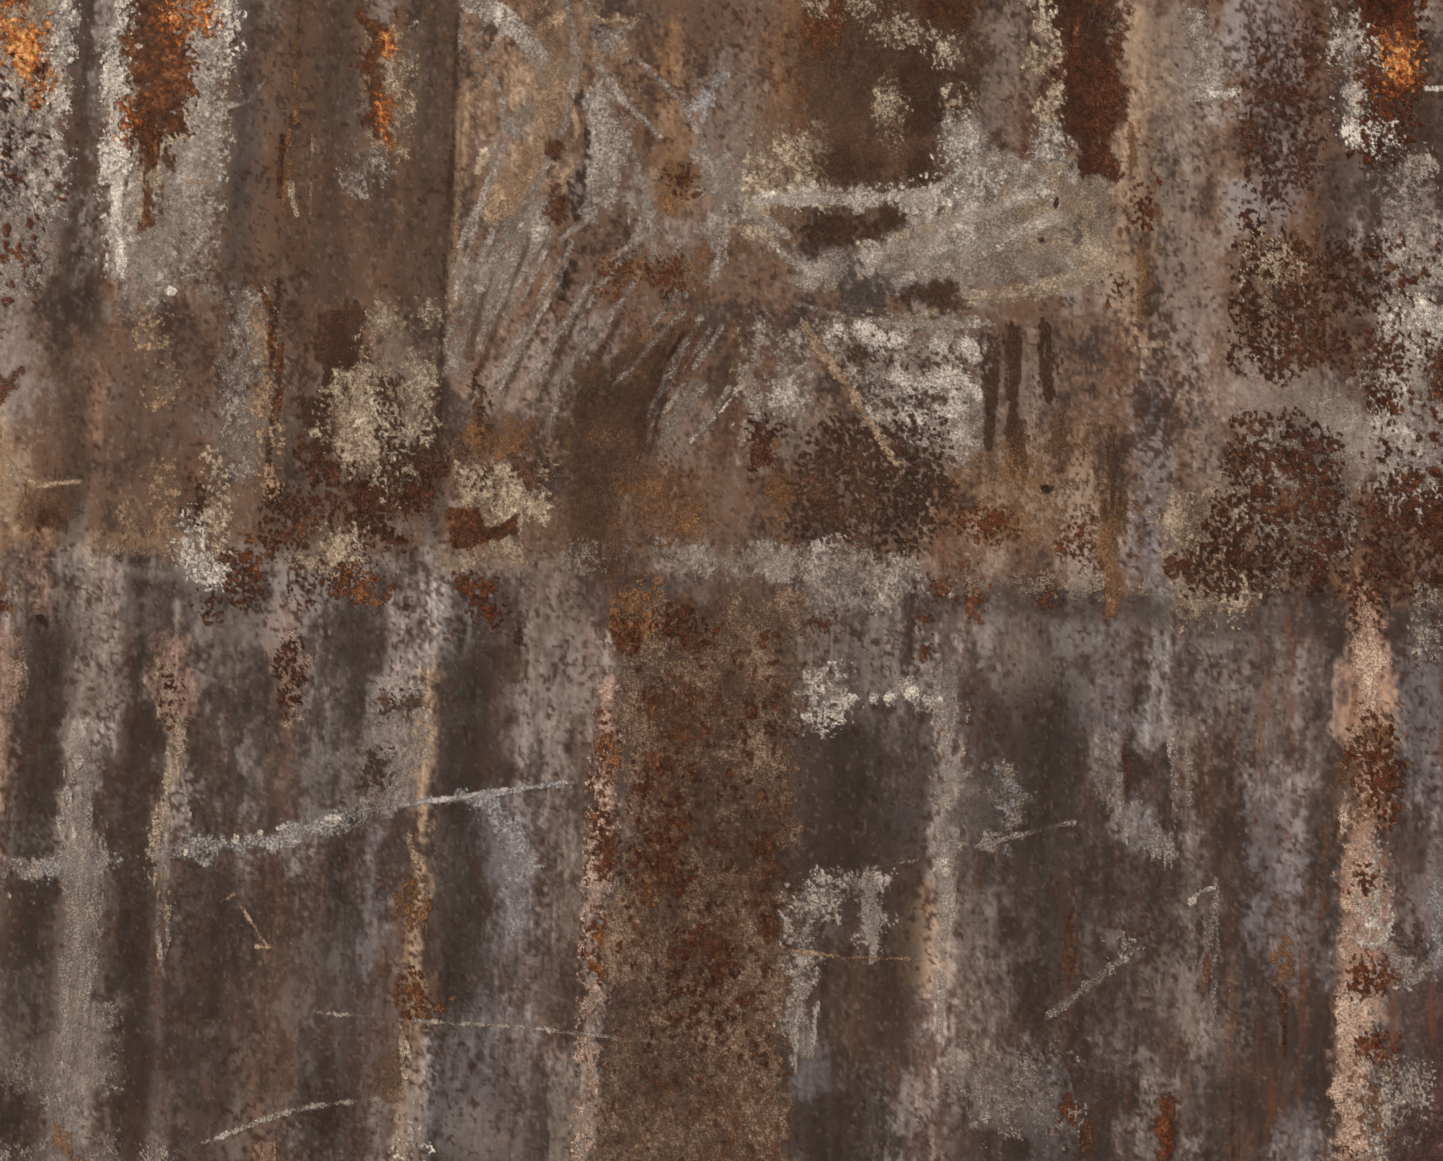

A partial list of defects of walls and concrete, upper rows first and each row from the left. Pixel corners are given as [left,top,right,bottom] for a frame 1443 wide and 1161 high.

corrosion [0,0,78,306]
corrosion [106,0,230,237]
corrosion [348,6,401,151]
corrosion [591,242,753,304]
corrosion [655,155,706,217]
corrosion [759,0,993,319]
corrosion [1029,0,1164,323]
corrosion [1162,0,1443,656]
corrosion [155,639,185,731]
corrosion [190,300,814,1161]